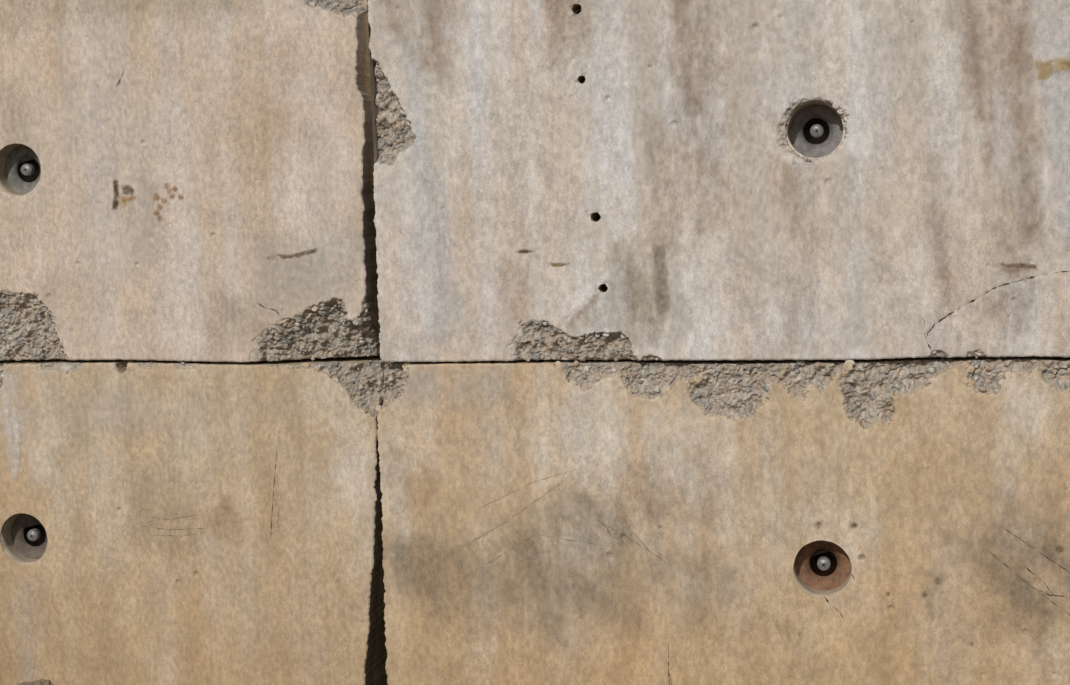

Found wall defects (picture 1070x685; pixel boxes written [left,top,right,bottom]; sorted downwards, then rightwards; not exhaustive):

spalling [304,0,368,19]
spalling [372,59,416,166]
spalling [0,290,91,388]
spalling [247,294,411,420]
spalling [507,320,1070,430]